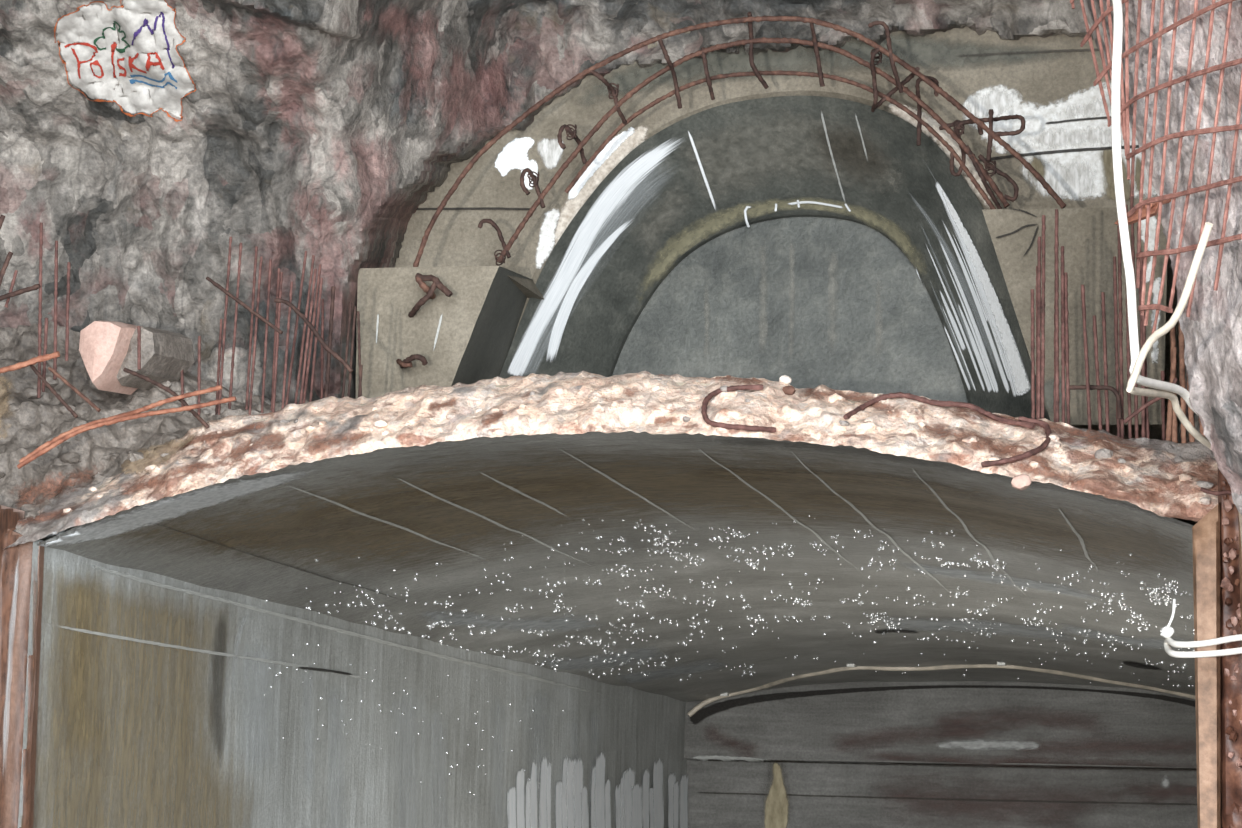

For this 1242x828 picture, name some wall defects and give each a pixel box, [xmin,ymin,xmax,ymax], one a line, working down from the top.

spalling [0,12,1218,549]
water stain [508,114,912,376]
water stain [1102,149,1141,201]